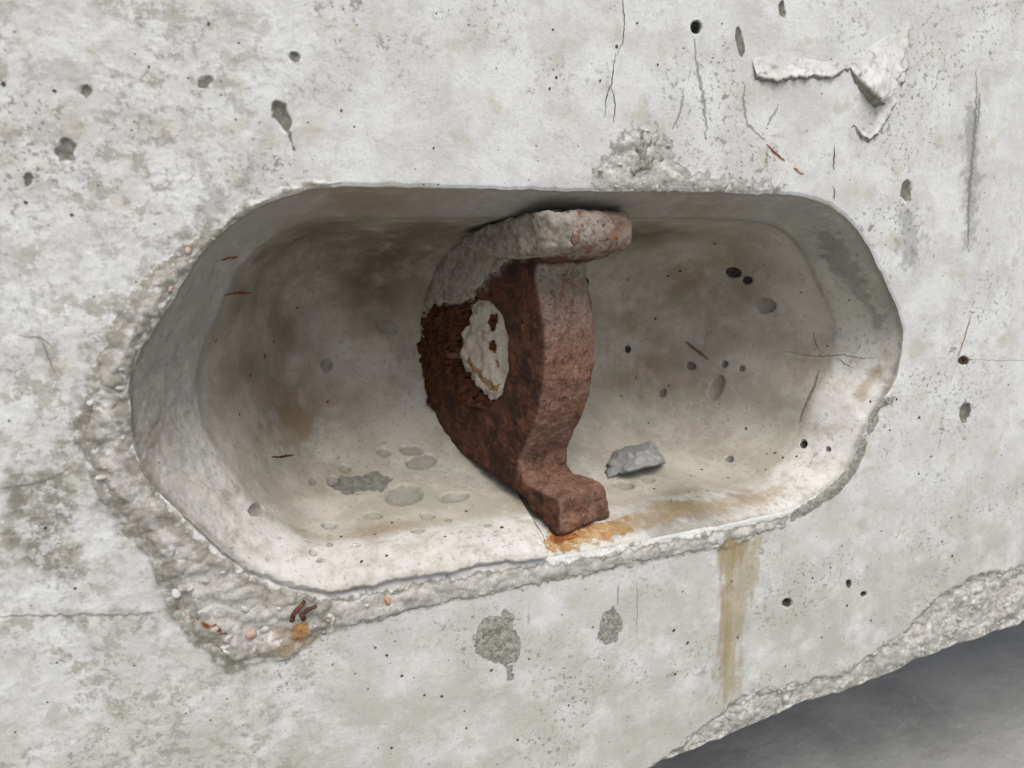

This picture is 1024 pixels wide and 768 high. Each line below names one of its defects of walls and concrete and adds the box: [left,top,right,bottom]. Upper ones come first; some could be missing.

crack [605,0,625,122]
spalling [592,122,787,193]
corrosion [467,357,501,391]
corrosion [488,313,500,368]
crack [786,331,878,423]
spalling [83,212,895,662]
corrosion [544,516,633,553]
spalling [649,566,1024,768]